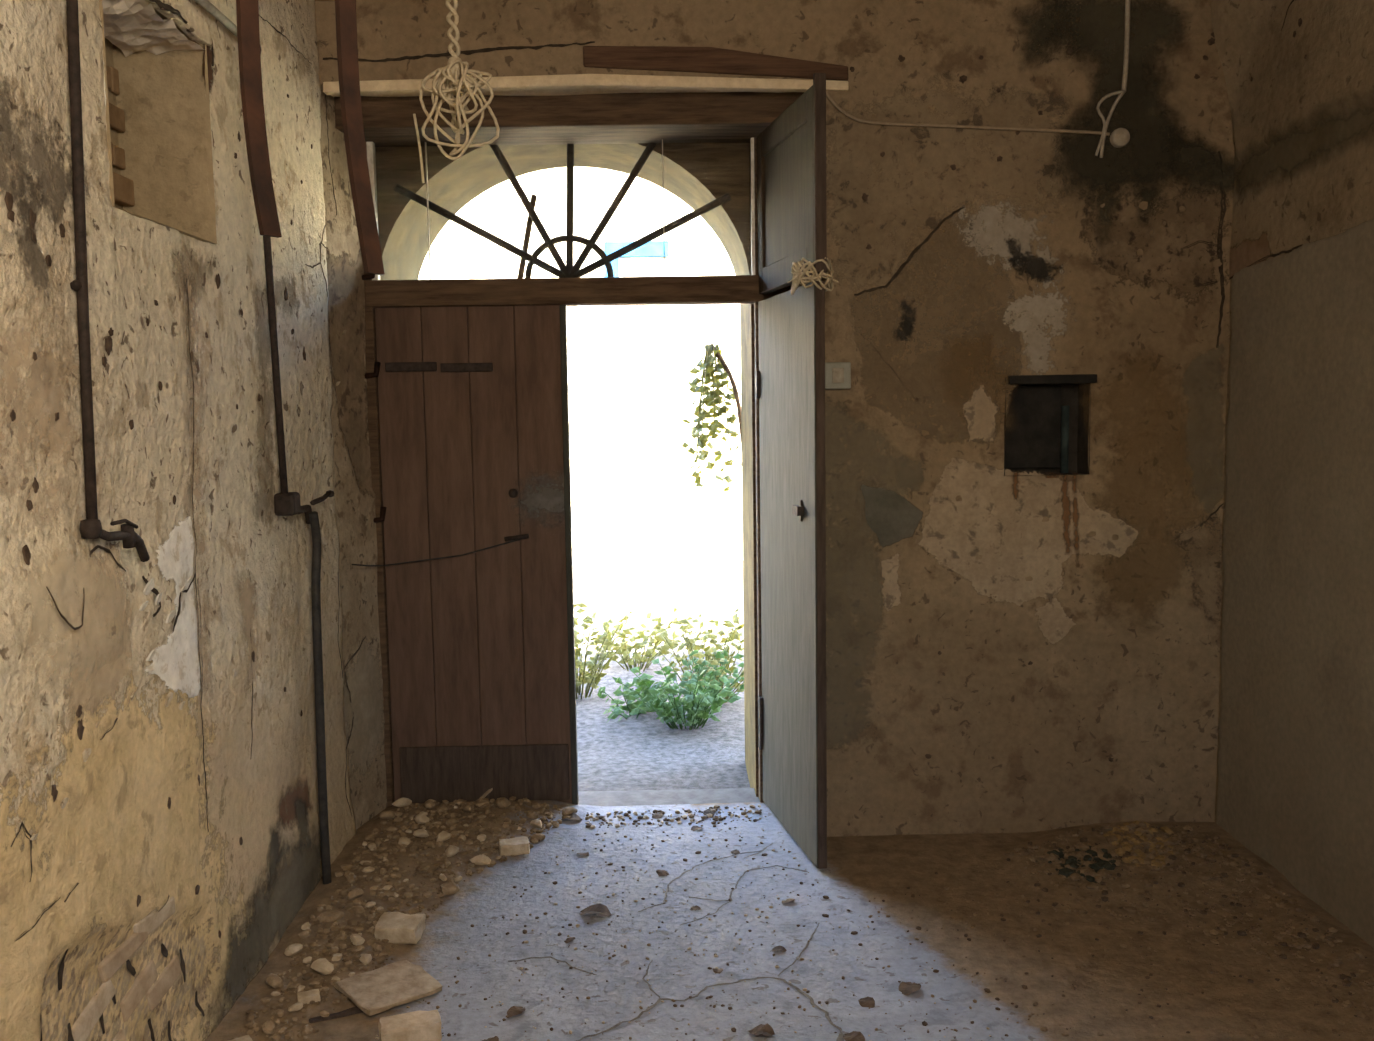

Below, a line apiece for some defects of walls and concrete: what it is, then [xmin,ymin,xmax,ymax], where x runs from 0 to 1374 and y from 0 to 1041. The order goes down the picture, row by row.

water stain [0,80,90,289]
crack [259,15,595,64]
water stain [1013,0,1374,236]
crack [1181,151,1310,348]
peeling [850,206,1139,645]
peeling [0,516,253,1041]
crack [518,957,596,975]
crack [576,923,845,1041]
crack [638,843,807,925]